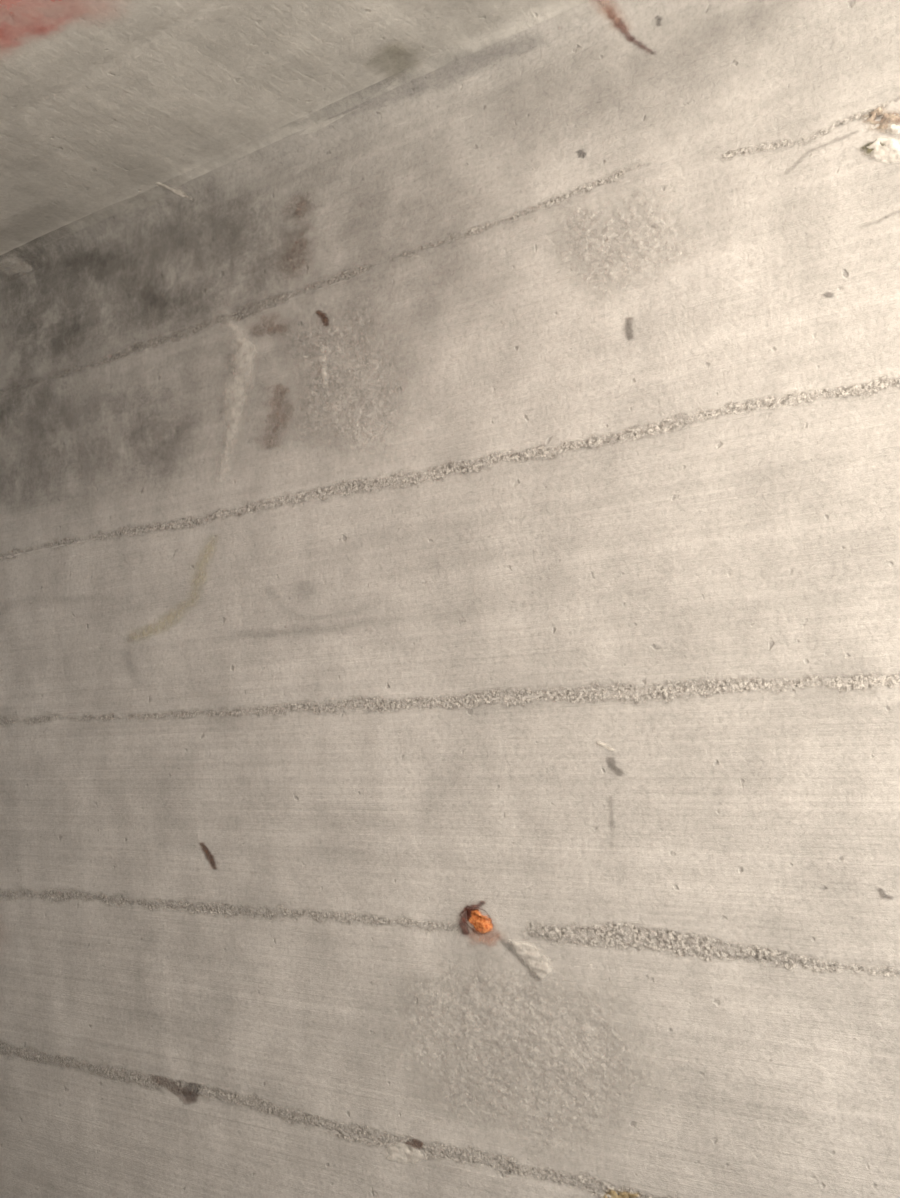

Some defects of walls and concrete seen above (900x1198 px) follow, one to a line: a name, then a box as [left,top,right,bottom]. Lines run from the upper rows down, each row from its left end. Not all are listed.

rust [469,910,493,934]